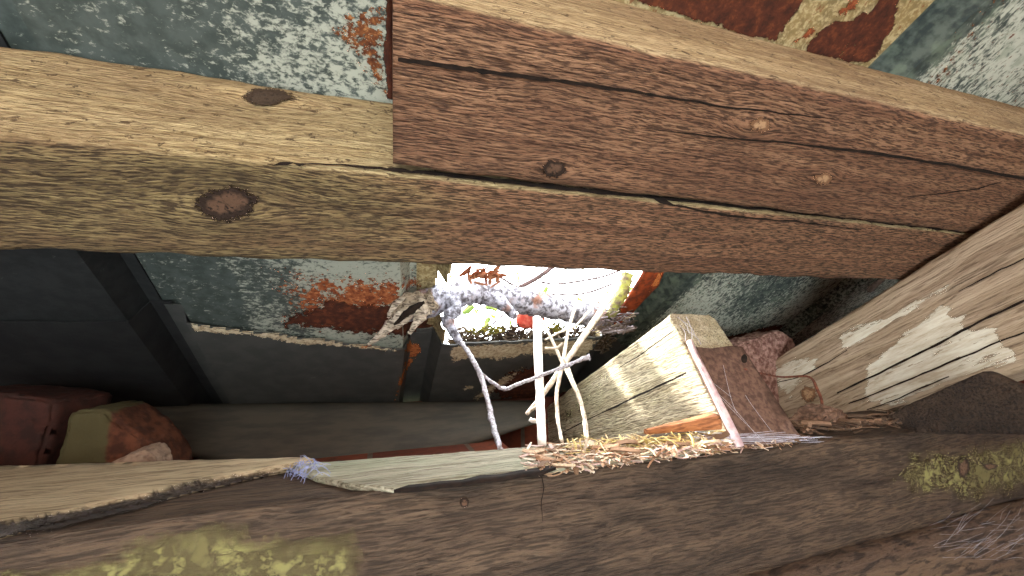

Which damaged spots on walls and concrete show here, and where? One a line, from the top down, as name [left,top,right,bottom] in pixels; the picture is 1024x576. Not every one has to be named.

corrosion [332,0,393,100]
corrosion [637,0,803,42]
corrosion [793,0,899,63]
crack [398,58,828,119]
crack [267,162,961,233]
corrosion [268,267,433,401]
peeling [775,358,818,398]
peeling [839,284,1017,407]